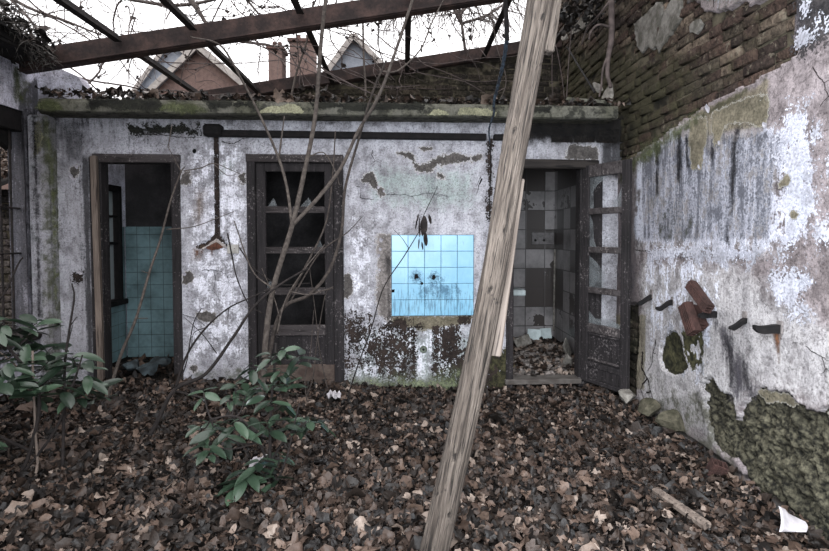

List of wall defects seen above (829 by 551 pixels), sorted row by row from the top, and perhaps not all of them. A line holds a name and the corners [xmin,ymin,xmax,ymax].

peeling [358,171,387,198]
peeling [396,146,484,180]
damp [676,133,690,180]
flaking render [551,0,829,336]
damp [728,127,739,215]
flaking render [705,378,829,541]